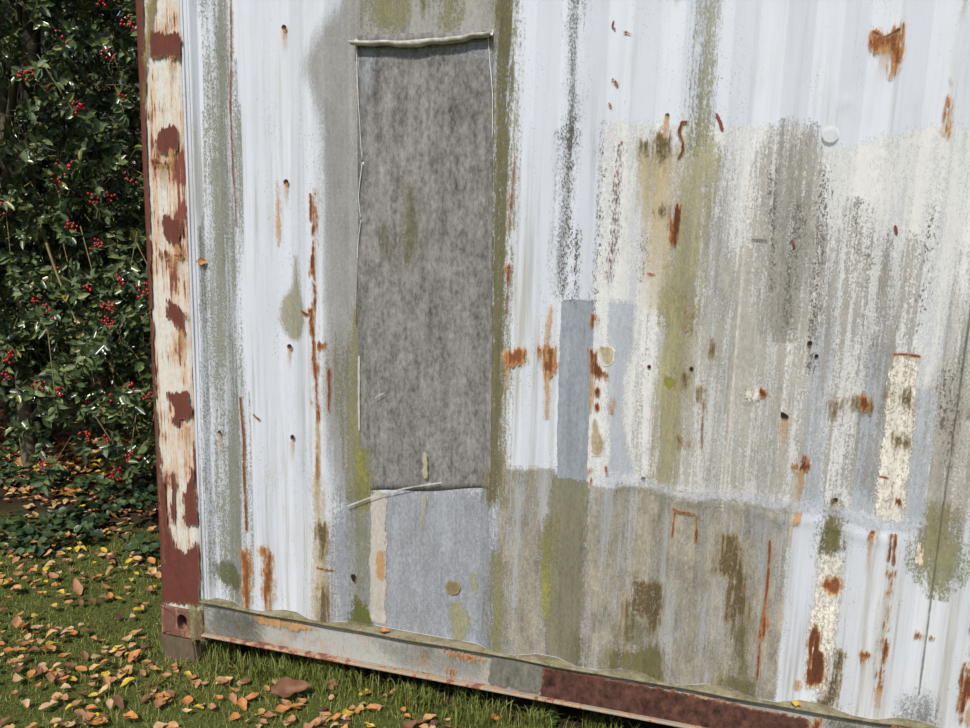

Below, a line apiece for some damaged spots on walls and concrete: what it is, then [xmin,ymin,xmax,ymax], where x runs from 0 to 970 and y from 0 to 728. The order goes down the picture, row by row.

rust [869,22,905,79]
water stain [555,0,579,297]
rust [158,248,187,261]
rust [502,304,558,418]
rust [239,189,337,631]
rust [443,650,485,676]
rust [540,666,822,728]
water stain [723,620,749,675]
rust [957,662,970,726]